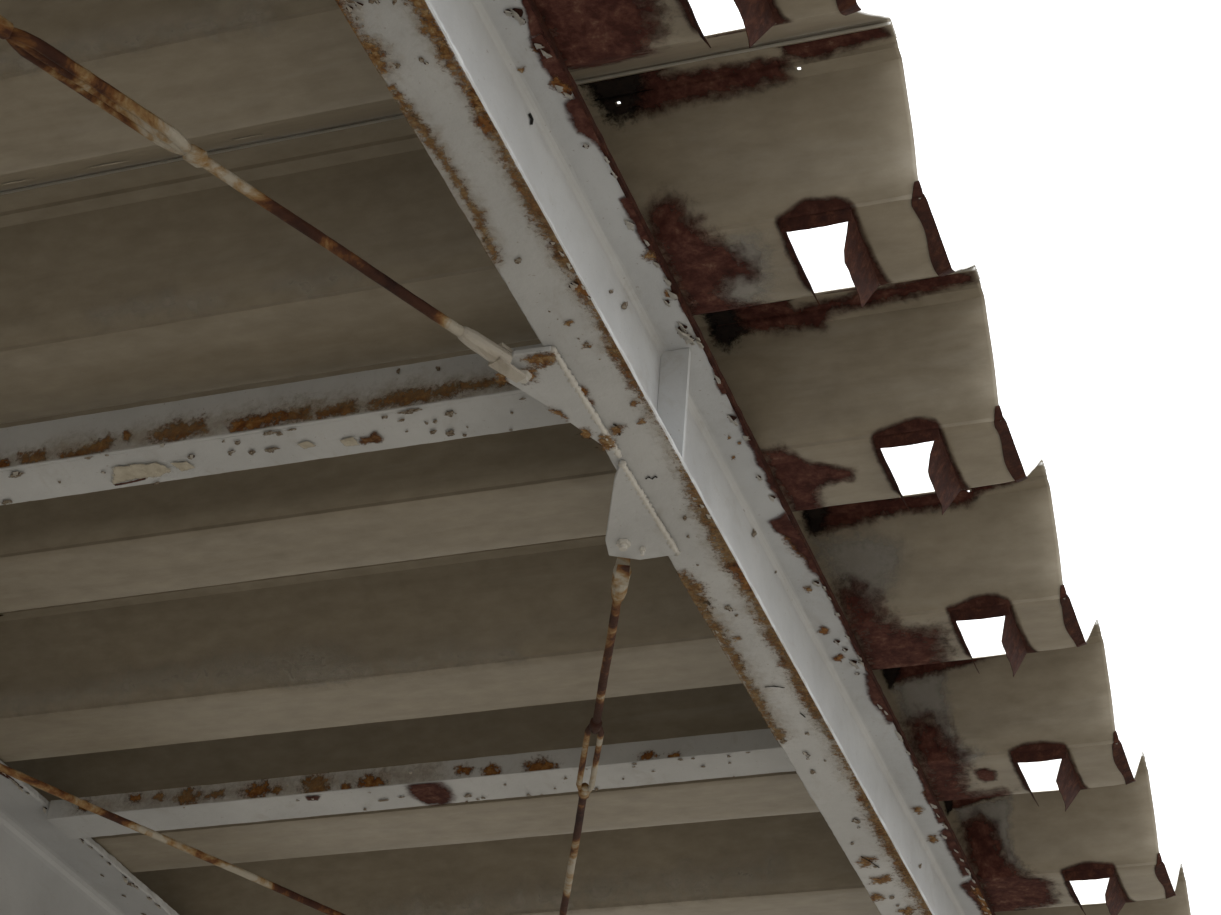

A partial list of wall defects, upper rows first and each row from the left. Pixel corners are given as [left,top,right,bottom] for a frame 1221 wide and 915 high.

rust [335,0,503,264]
rust [227,373,510,433]
rust [0,430,132,468]
rust [148,413,208,444]
rust [359,432,383,445]
rust [404,0,974,915]
rust [711,362,1135,915]
rust [129,780,282,805]
rust [301,772,384,793]